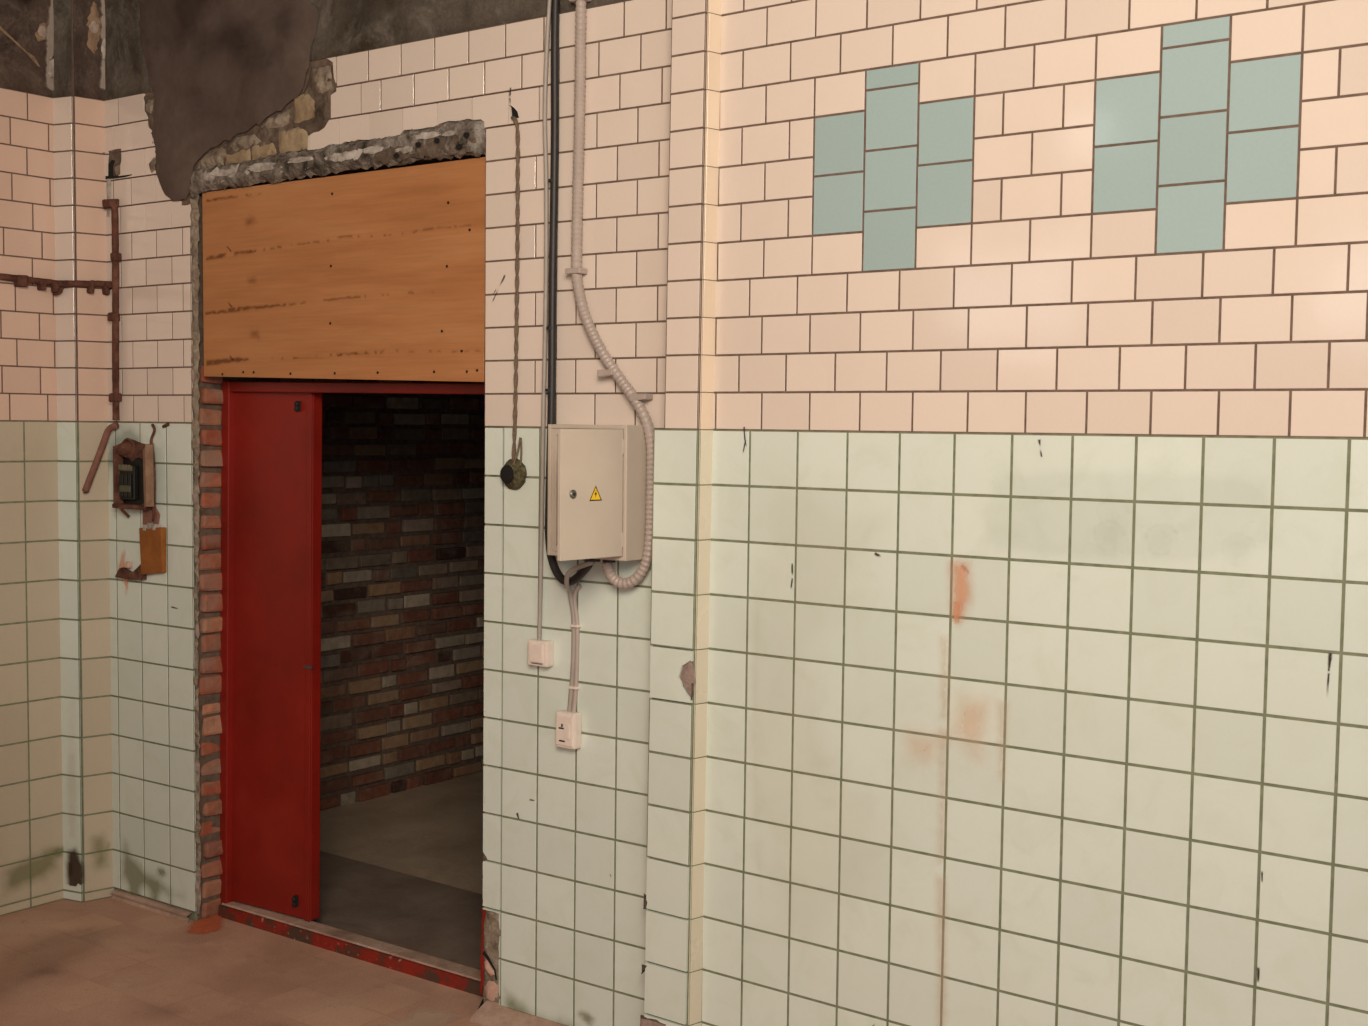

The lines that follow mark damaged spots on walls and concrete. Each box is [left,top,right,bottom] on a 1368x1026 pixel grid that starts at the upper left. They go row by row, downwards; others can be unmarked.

flaking render [35,0,54,90]
peeling [86,0,106,89]
spalling [190,65,476,914]
spalling [680,661,695,700]
spalling [480,908,501,1002]
spalling [640,1015,666,1026]